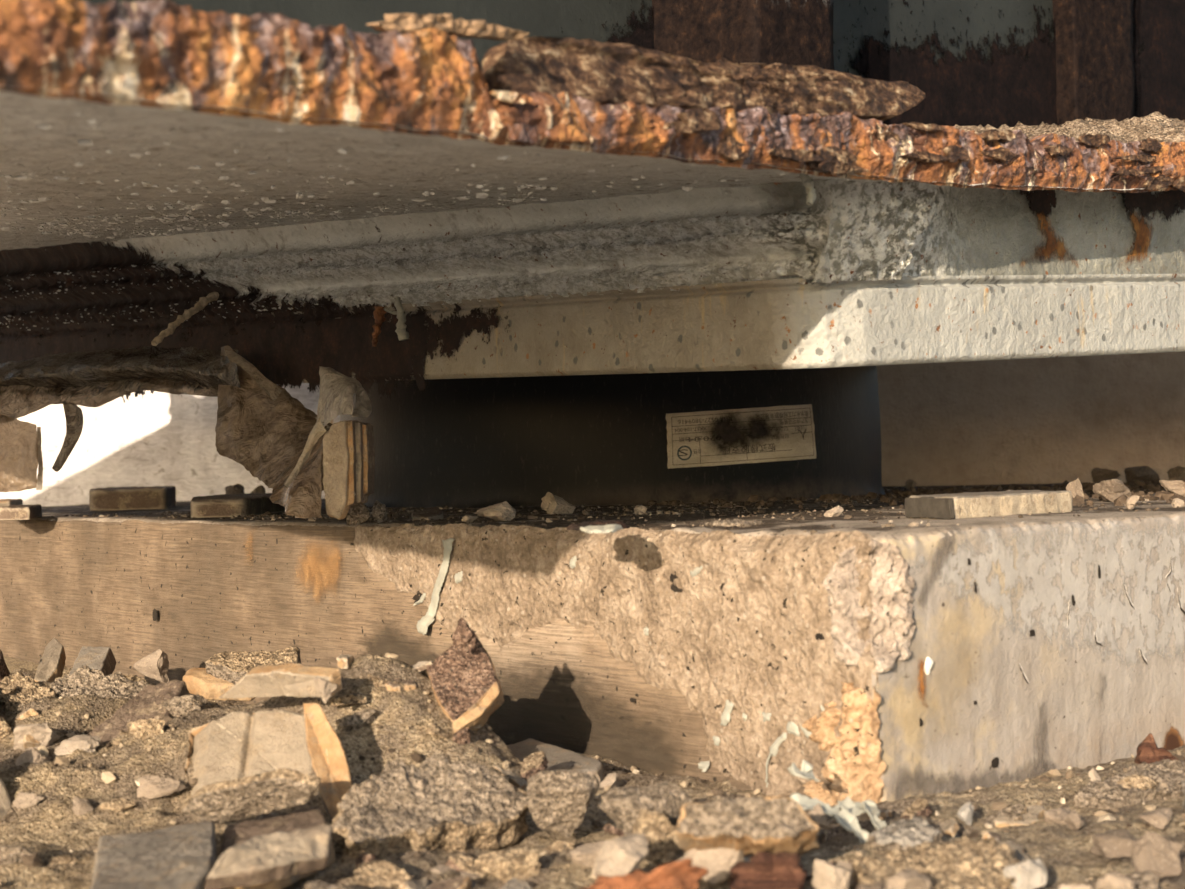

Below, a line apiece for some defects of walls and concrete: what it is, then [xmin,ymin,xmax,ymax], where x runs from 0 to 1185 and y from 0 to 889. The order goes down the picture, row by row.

rust [366,0,1058,129]
rust [1133,0,1185,120]
rust [1009,189,1077,266]
rust [1113,190,1185,262]
peeling [905,490,1185,665]
spalling [354,523,925,806]